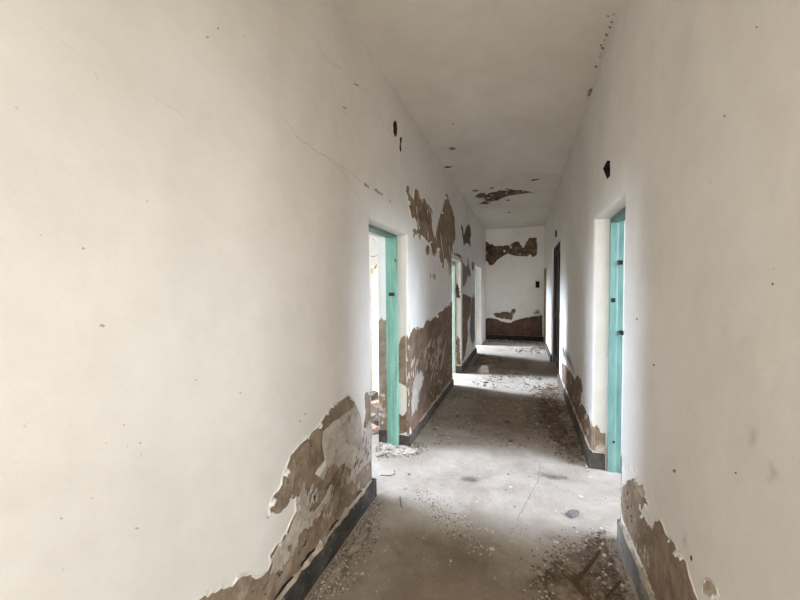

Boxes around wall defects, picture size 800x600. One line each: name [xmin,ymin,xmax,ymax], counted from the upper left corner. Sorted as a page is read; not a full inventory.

flaking render [472,178,542,205]
peeling [486,236,538,266]
peeling [399,183,474,435]
flaking render [486,308,543,336]
peeling [561,361,606,453]
peeling [192,318,387,600]
peeling [620,463,720,600]